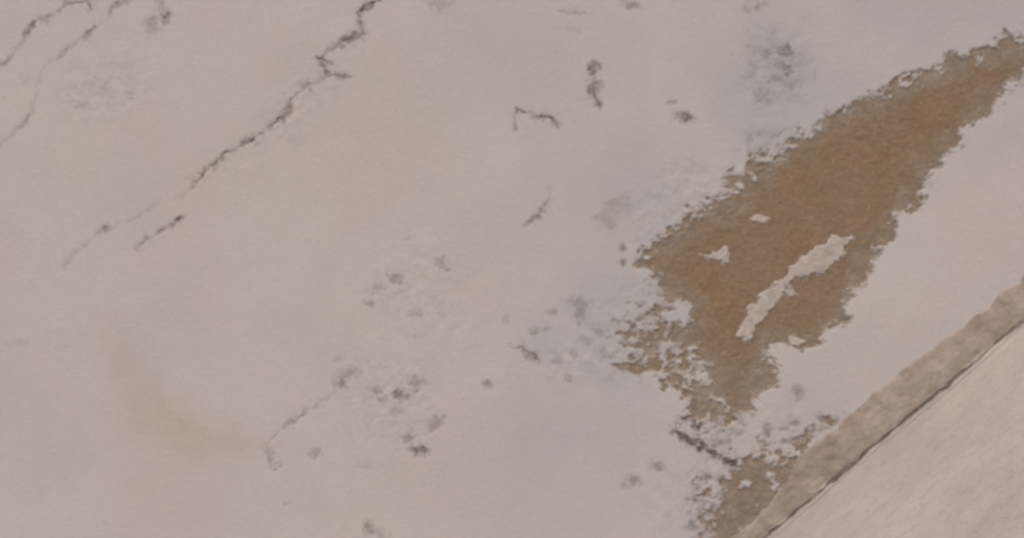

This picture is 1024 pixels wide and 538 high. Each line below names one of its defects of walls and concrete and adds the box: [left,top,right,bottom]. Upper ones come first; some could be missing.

crack [0,0,137,151]
crack [60,0,384,272]
crack [520,185,554,231]
crack [510,105,565,132]
peeling [526,28,1024,538]